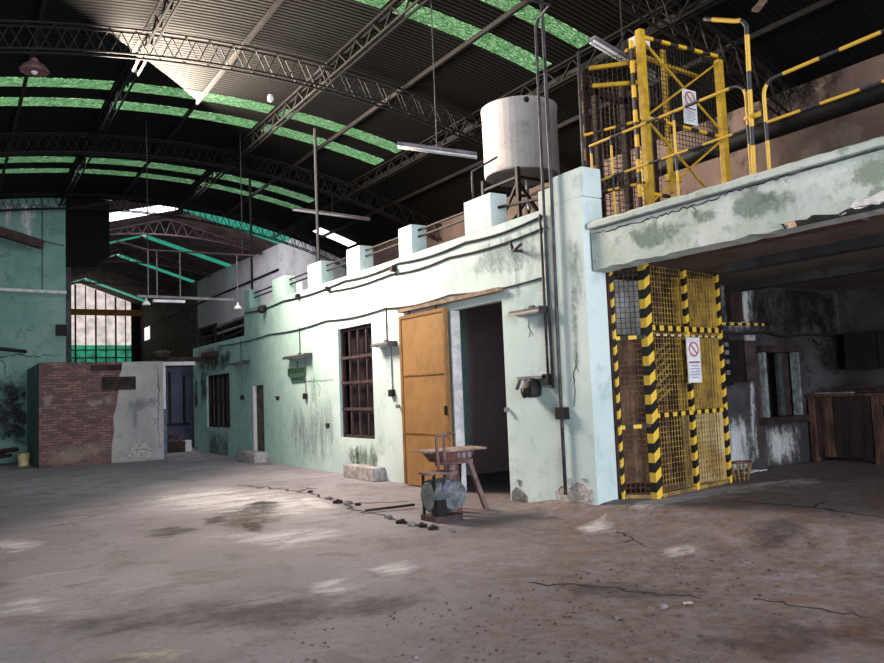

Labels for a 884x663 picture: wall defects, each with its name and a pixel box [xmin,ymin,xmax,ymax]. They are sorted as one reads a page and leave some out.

water stain [729,367,764,468]
spalling [555,478,593,503]
crack [733,500,884,518]